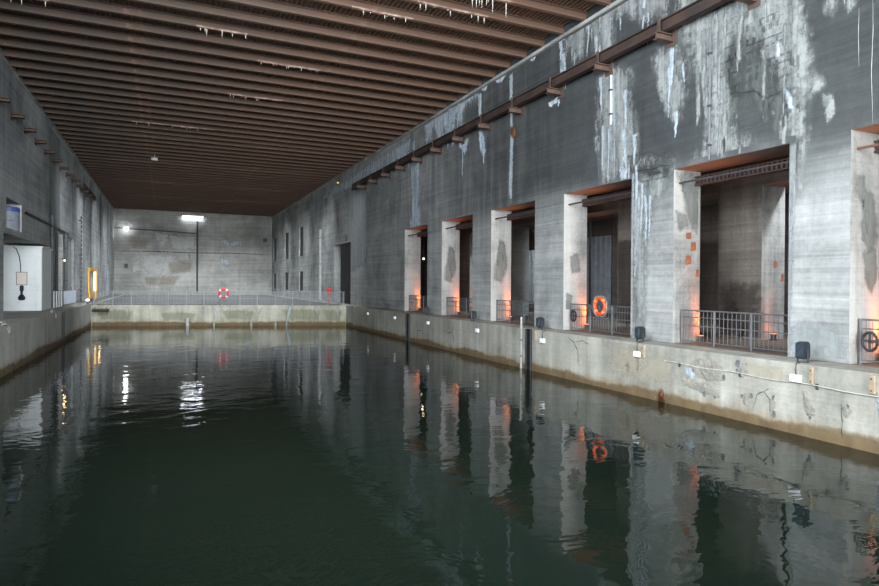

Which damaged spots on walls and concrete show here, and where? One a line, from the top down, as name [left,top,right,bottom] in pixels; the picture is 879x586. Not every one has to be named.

damp [417,0,515,21]
damp [559,0,696,72]
damp [595,67,675,331]
damp [654,0,847,359]